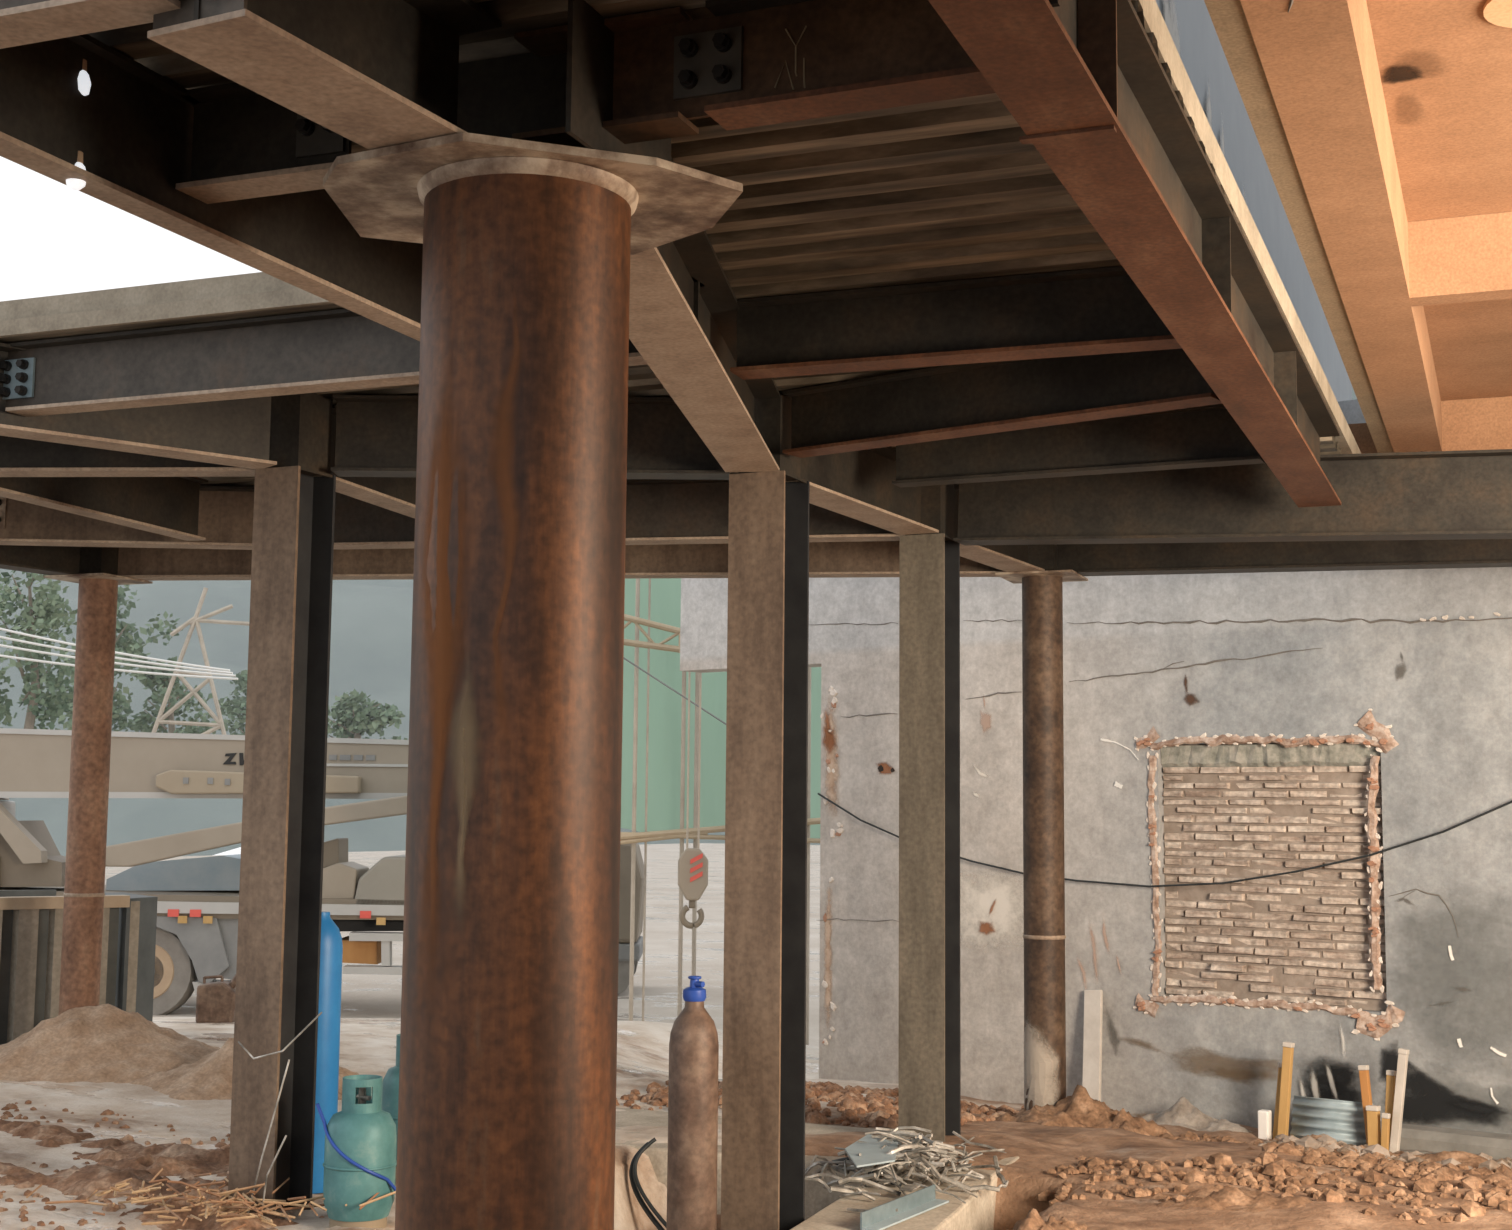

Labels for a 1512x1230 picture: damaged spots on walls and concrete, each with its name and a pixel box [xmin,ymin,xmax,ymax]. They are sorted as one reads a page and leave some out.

rust [425,413,462,916]
flaking render [820,686,844,838]
crack [969,691,1016,699]
crack [1067,612,1512,682]
flaking render [1133,708,1405,1041]
flaking render [821,877,837,1045]